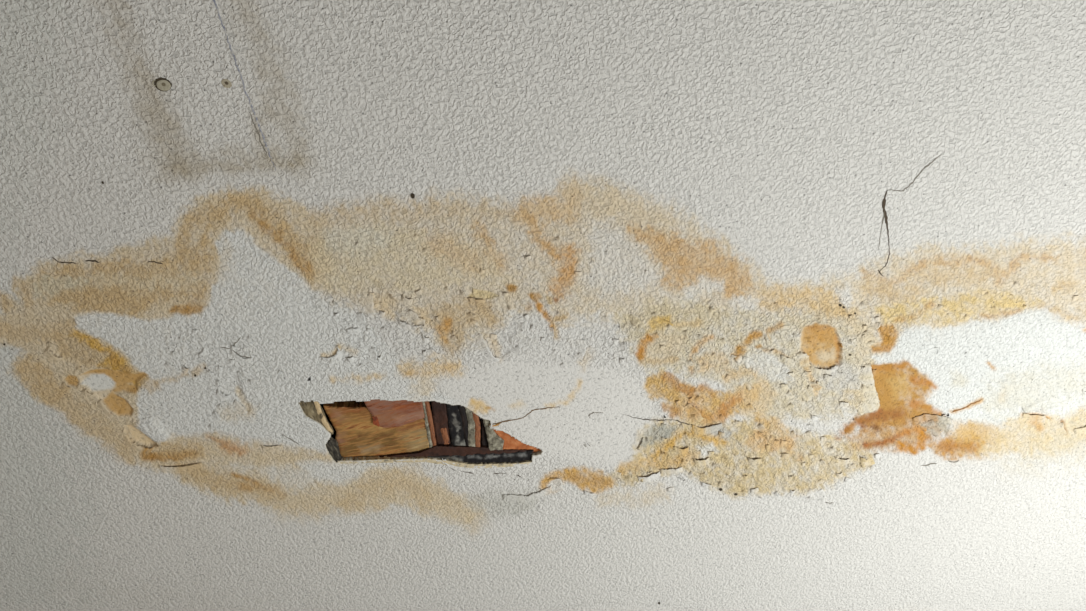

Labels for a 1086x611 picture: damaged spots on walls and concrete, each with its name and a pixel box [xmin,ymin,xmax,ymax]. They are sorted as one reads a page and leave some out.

damp [0,165,1086,534]
peeling [63,226,1086,506]
crack [878,154,942,276]